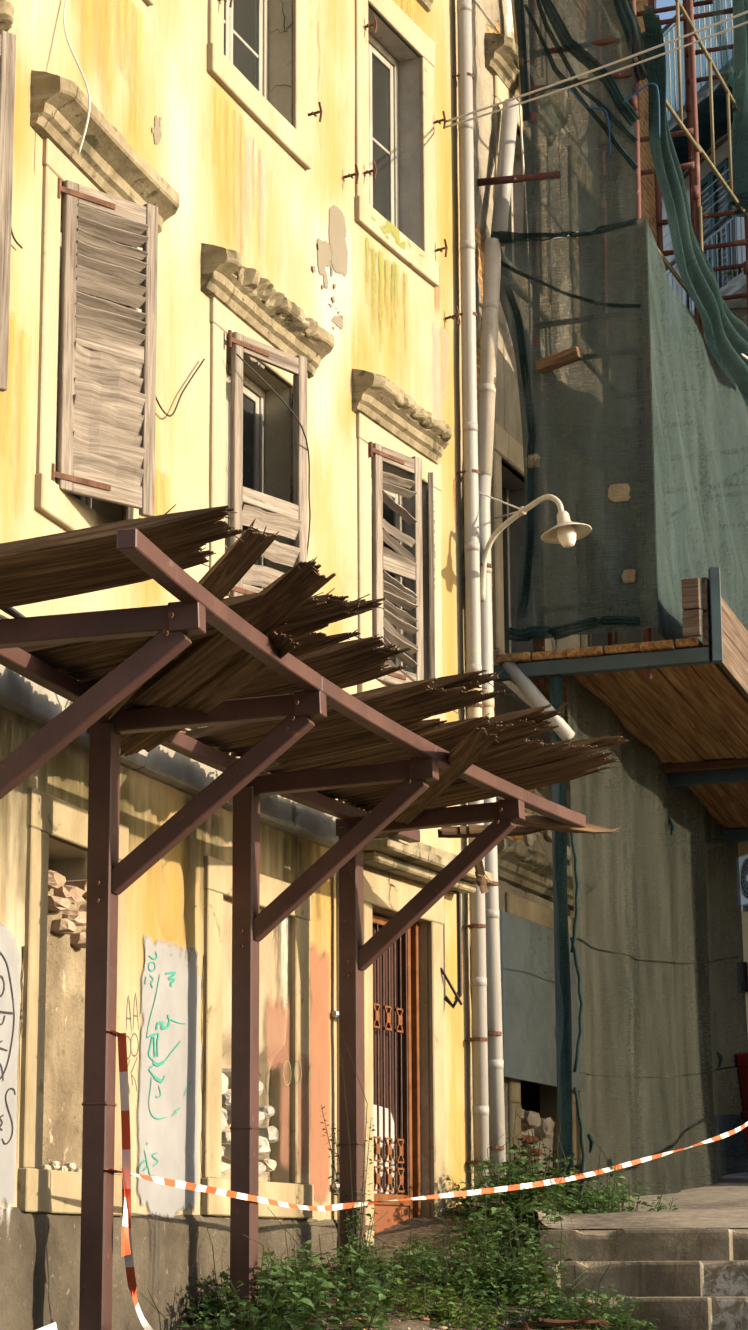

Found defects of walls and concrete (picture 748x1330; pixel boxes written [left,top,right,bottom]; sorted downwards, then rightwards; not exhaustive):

flaking render [313,205,348,330]
leakage [366,238,407,327]